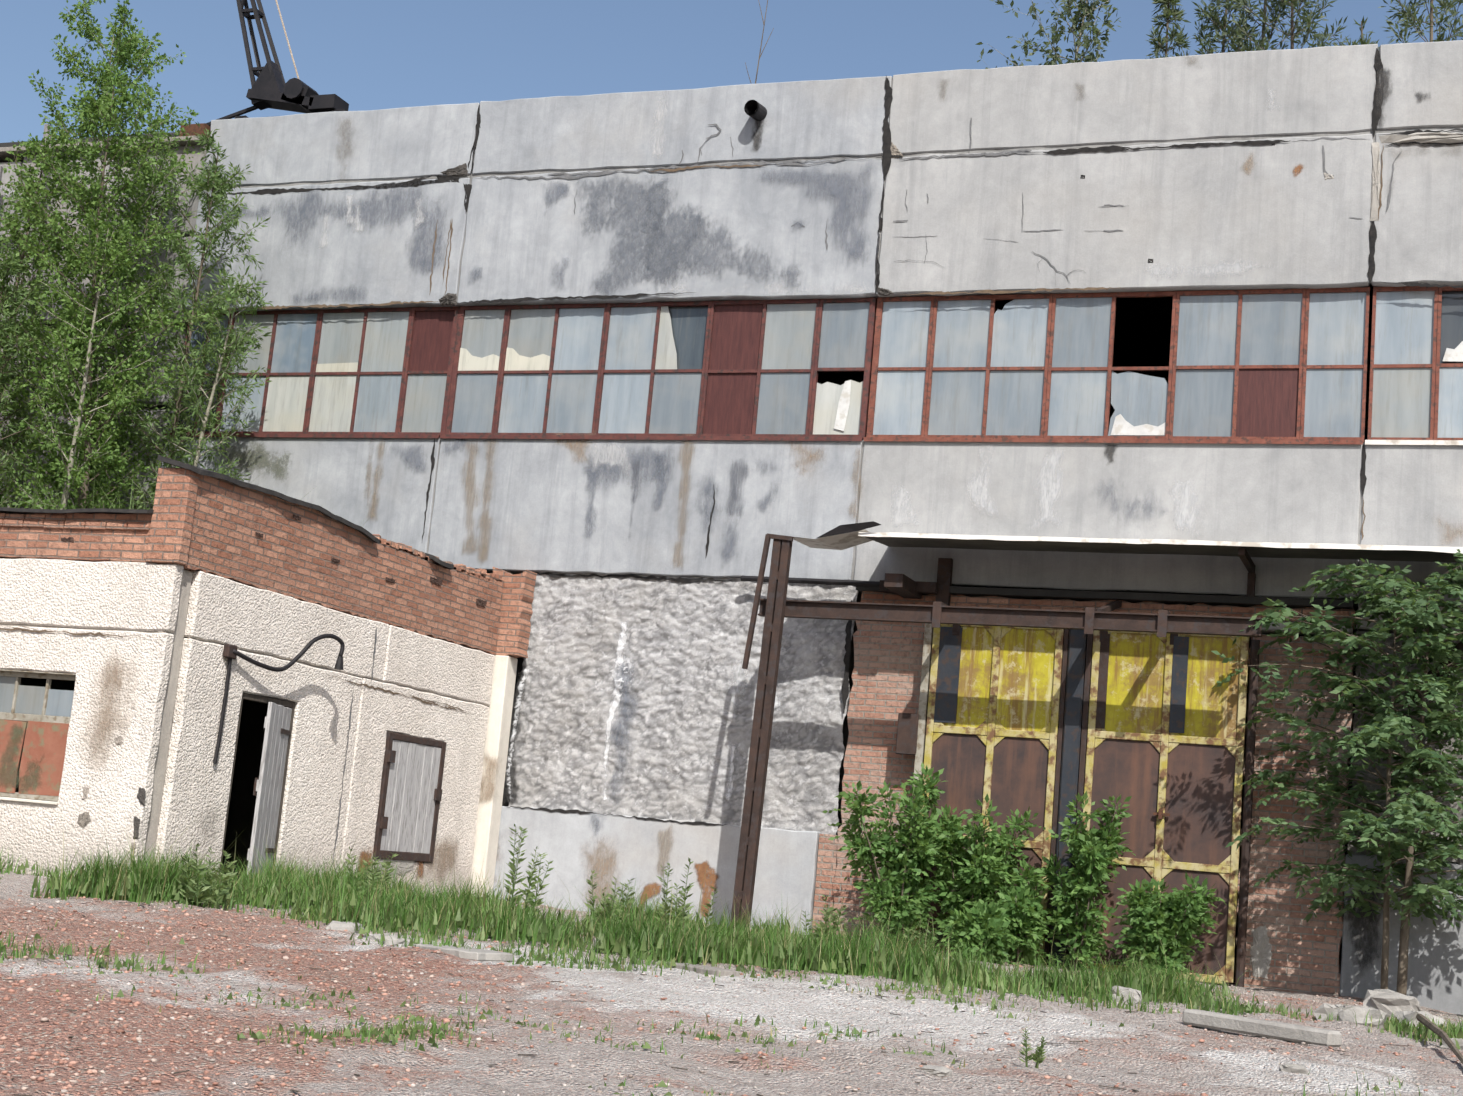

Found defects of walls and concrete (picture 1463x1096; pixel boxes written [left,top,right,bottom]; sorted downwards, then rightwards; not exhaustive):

crack [216,48,1384,295]
damp [287,188,441,272]
damp [586,445,669,530]
damp [705,463,747,557]
crack [1359,443,1367,539]
damp [95,666,122,750]
corrosion [640,883,661,907]
corrosion [695,862,718,917]